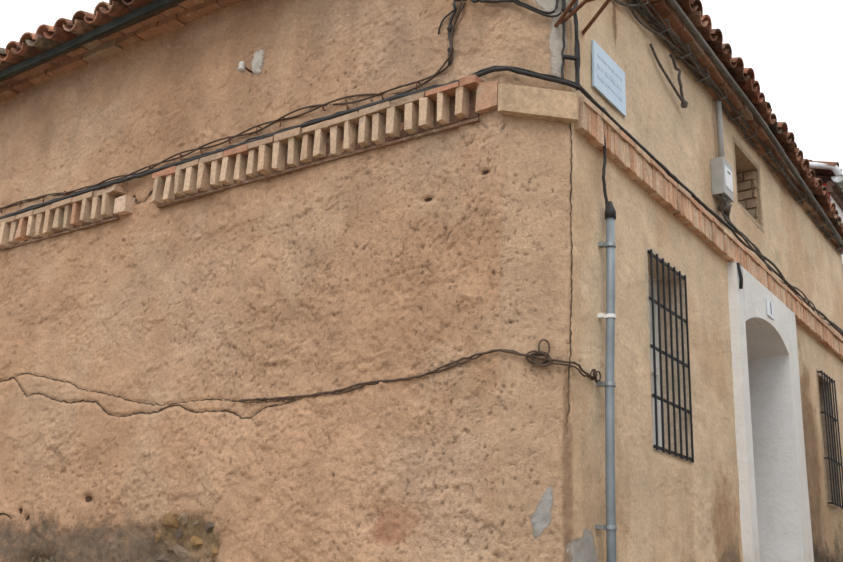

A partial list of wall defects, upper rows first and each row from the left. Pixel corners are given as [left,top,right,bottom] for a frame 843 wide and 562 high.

crack [0,373,303,419]
flaking render [149,512,220,562]